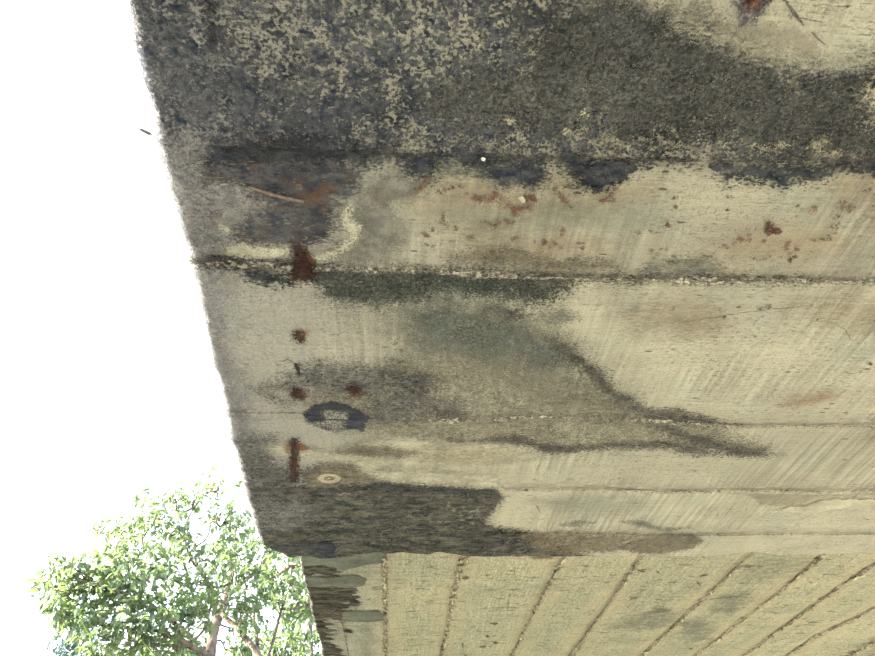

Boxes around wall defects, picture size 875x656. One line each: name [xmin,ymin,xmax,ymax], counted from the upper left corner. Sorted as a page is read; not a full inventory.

corrosion [435,184,537,227]
corrosion [286,239,319,283]
corrosion [722,221,799,263]
water stain [124,0,875,578]
corrosion [292,328,308,345]
corrosion [289,387,309,401]
corrosion [346,384,364,398]
corrosion [284,438,309,483]
water stain [304,580,362,656]